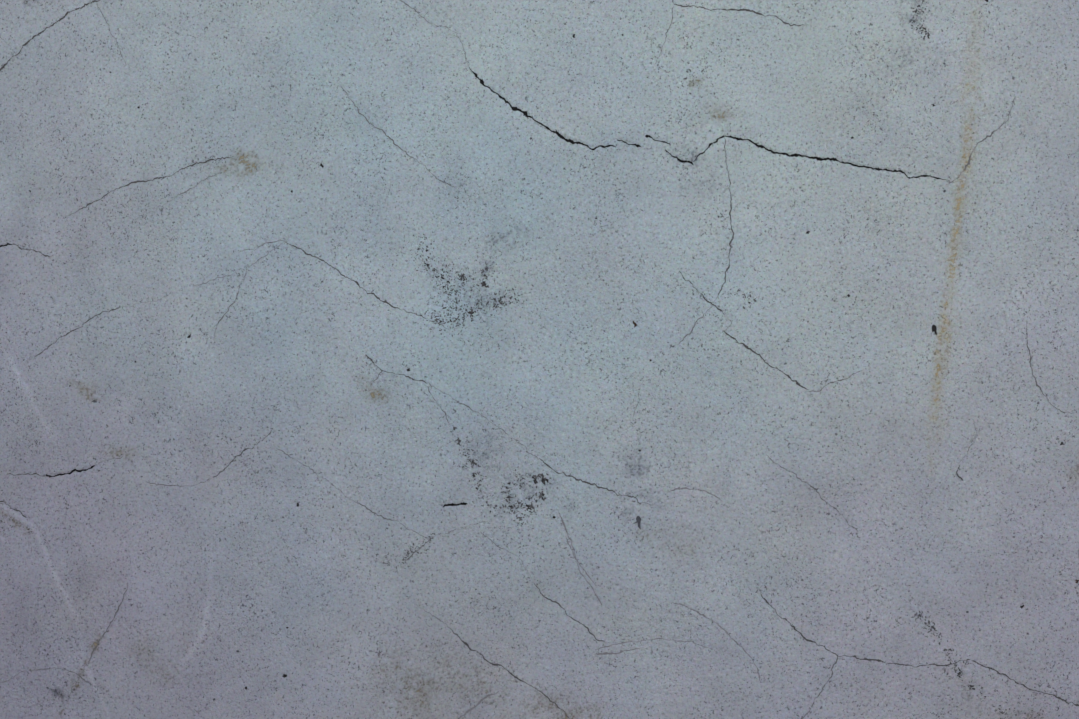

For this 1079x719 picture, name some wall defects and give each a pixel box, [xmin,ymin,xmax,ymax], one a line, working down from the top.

crack [0,0,126,71]
crack [68,157,229,218]
crack [341,86,455,188]
crack [400,0,1015,392]
crack [38,240,447,355]
crack [9,456,123,477]
crack [759,589,1079,719]